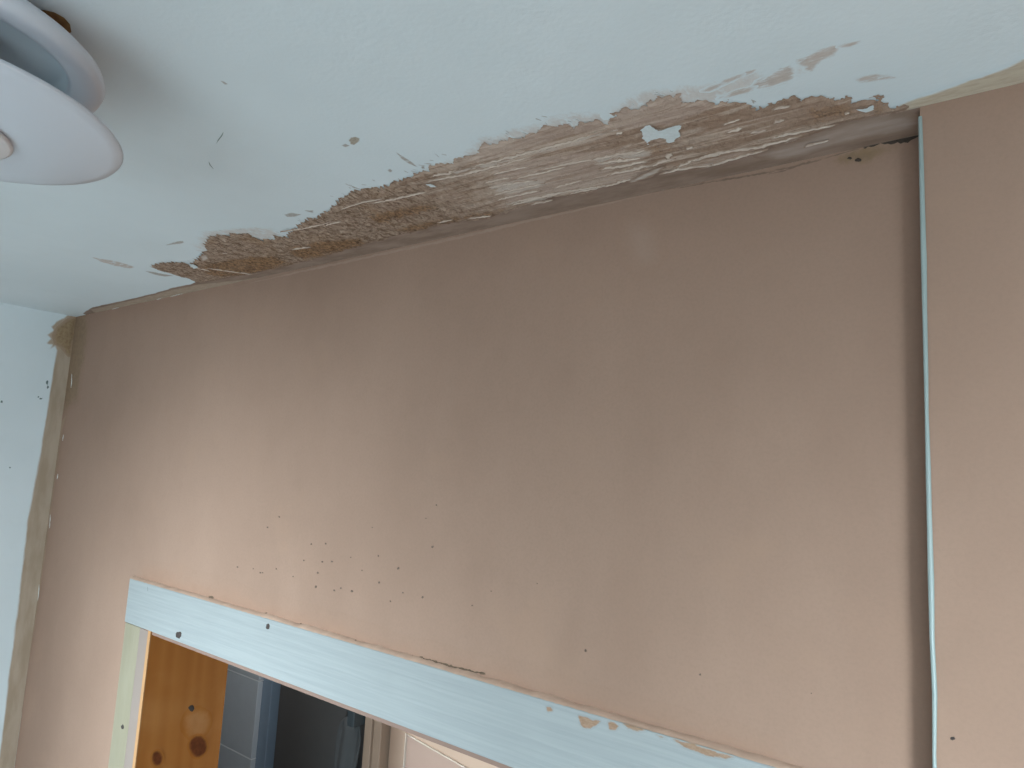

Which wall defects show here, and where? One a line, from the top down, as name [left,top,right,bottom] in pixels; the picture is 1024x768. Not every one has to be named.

peeling [152,64,909,283]
peeling [577,714,736,761]